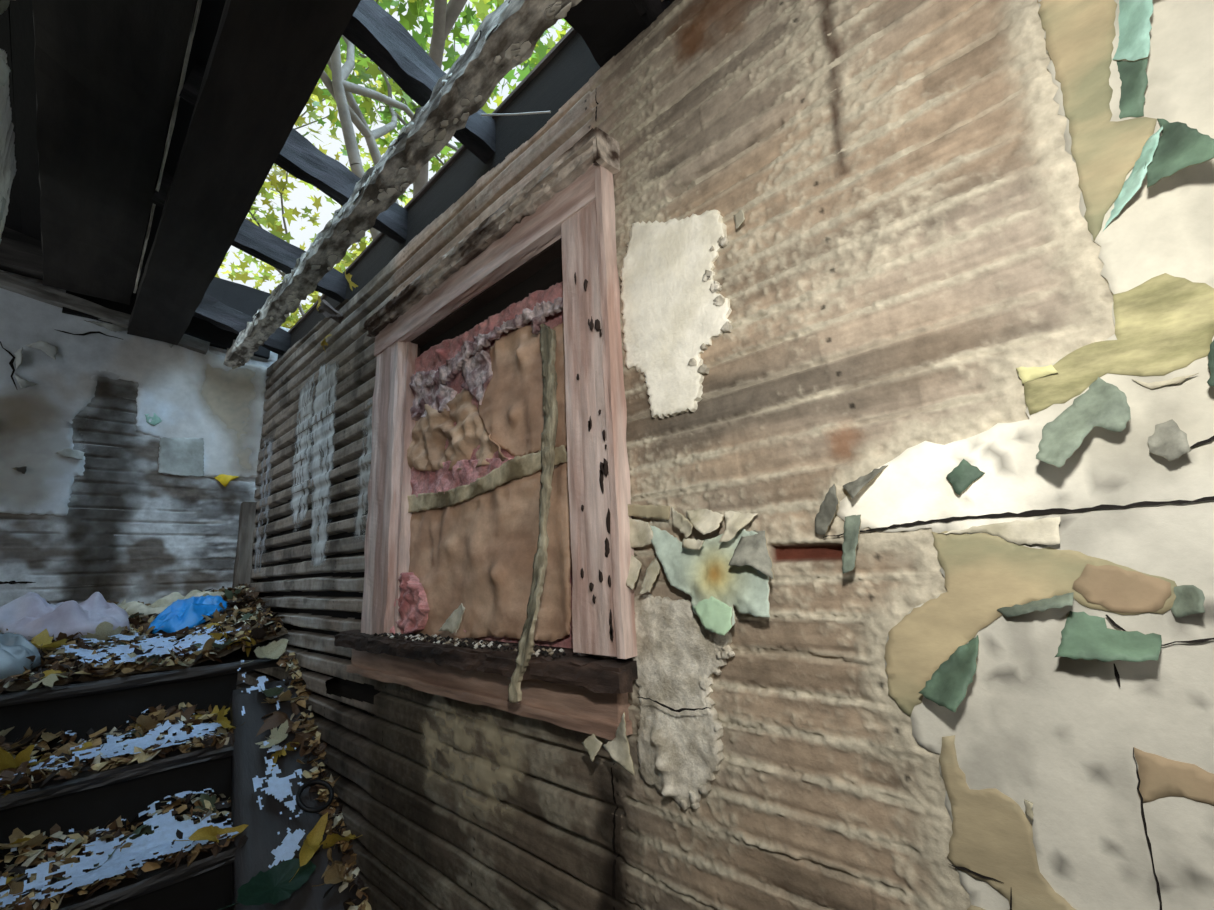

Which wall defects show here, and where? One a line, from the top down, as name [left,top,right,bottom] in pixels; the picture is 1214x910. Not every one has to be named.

peeling [0,56,11,86]
peeling [0,329,123,389]
flaking render [620,210,745,419]
water stain [62,377,138,602]
water stain [201,362,272,570]
water stain [291,363,338,564]
water stain [356,401,373,536]
peeling [946,459,985,495]
crack [823,496,1214,538]
water stain [424,710,523,814]
peeling [1024,799,1034,821]
crack [1133,747,1162,910]